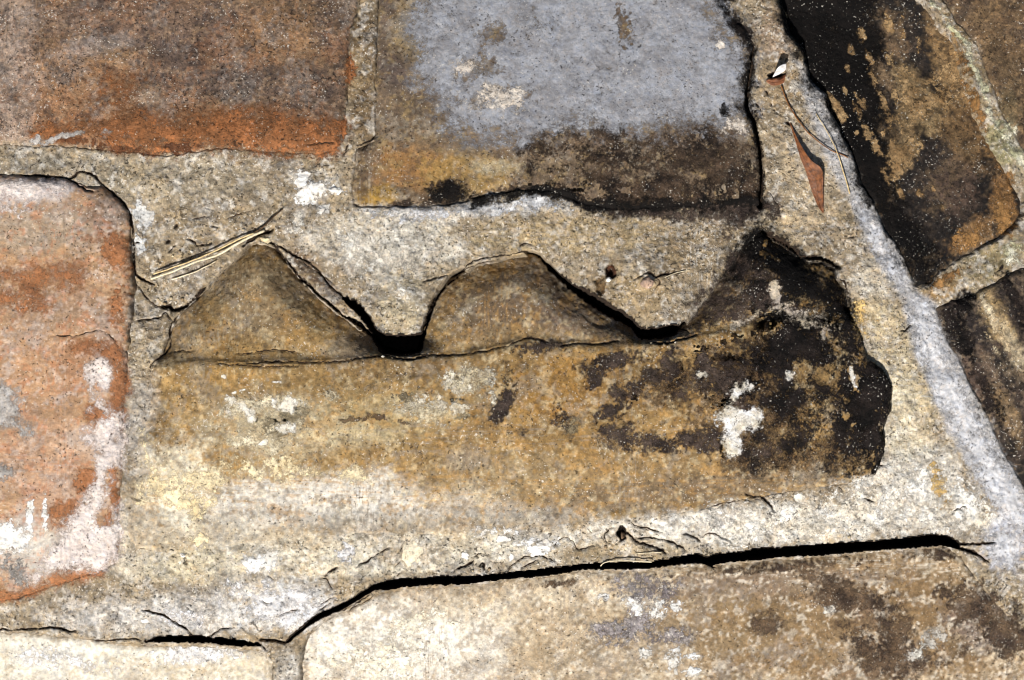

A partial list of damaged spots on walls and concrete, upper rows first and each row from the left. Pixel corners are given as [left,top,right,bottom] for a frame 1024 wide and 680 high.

spalling [595,265,616,298]
efflorescence [852,194,912,289]
water stain [644,286,1024,569]
crack [0,522,995,650]